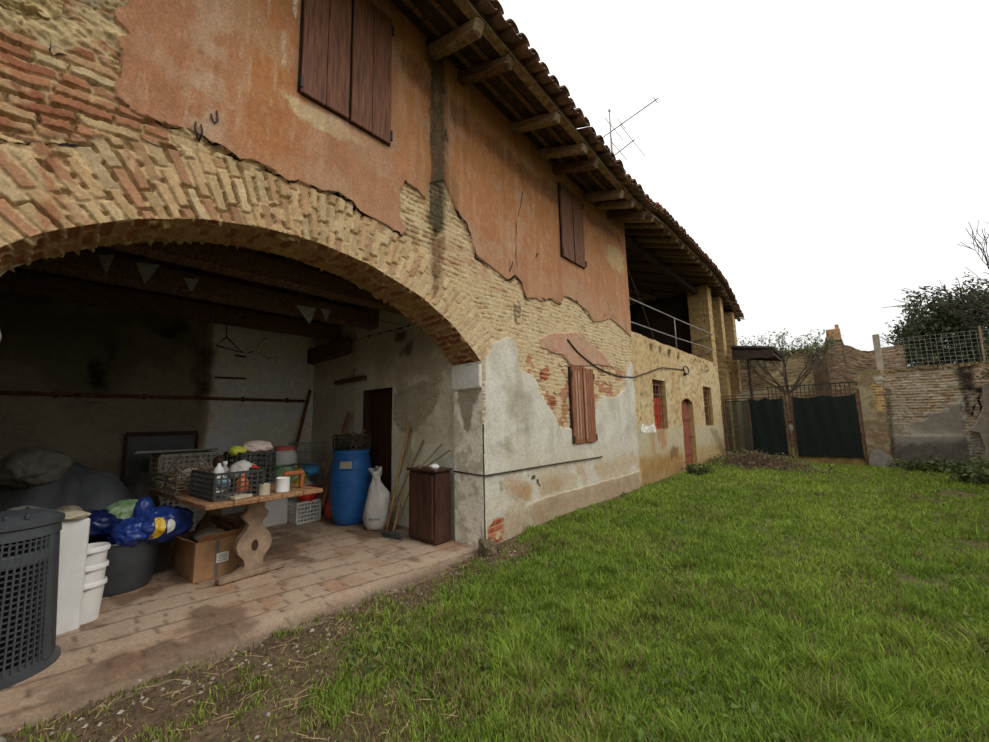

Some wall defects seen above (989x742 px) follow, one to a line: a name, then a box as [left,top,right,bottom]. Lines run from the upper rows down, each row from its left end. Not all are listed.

crack [1,139,82,147]
flaking render [0,0,275,172]
leakage [426,38,455,293]
flaking render [384,182,632,429]
crack [405,134,617,320]
crack [971,390,982,416]